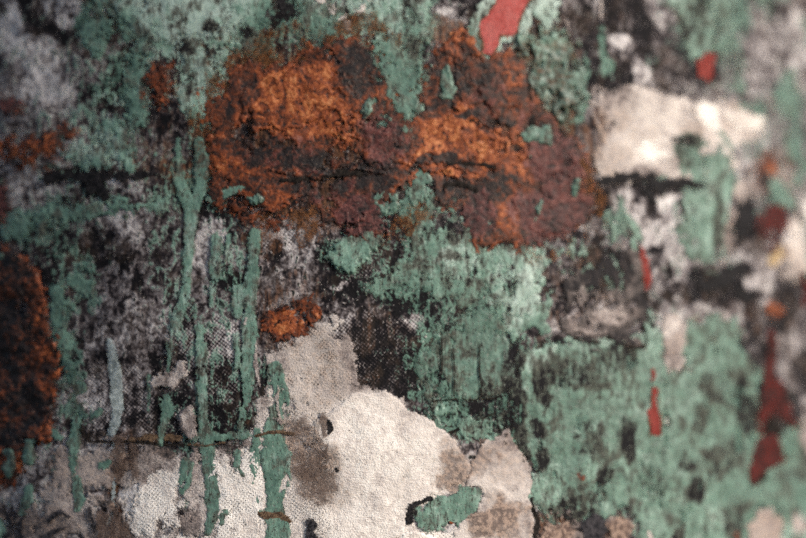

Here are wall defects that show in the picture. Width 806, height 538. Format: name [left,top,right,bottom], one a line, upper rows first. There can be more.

peeling [664,0,749,67]
corrosion [139,60,175,111]
corrosion [0,118,81,173]
corrosion [186,0,608,267]
peeling [639,97,766,266]
corrosion [0,242,67,492]
corrosion [259,293,323,342]
peeling [298,165,806,538]
peeling [179,405,197,439]
peeling [130,448,265,538]